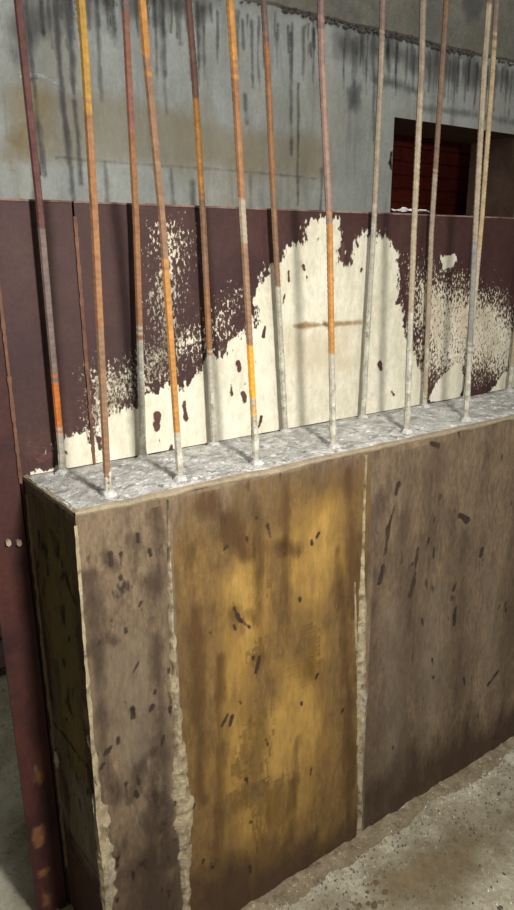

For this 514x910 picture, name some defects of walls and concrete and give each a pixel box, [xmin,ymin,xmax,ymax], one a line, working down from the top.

damp [14,0,81,175]
damp [133,0,211,56]
damp [340,34,509,94]
damp [83,572,102,681]
damp [365,713,514,826]
damp [198,829,357,910]
damp [372,801,514,909]